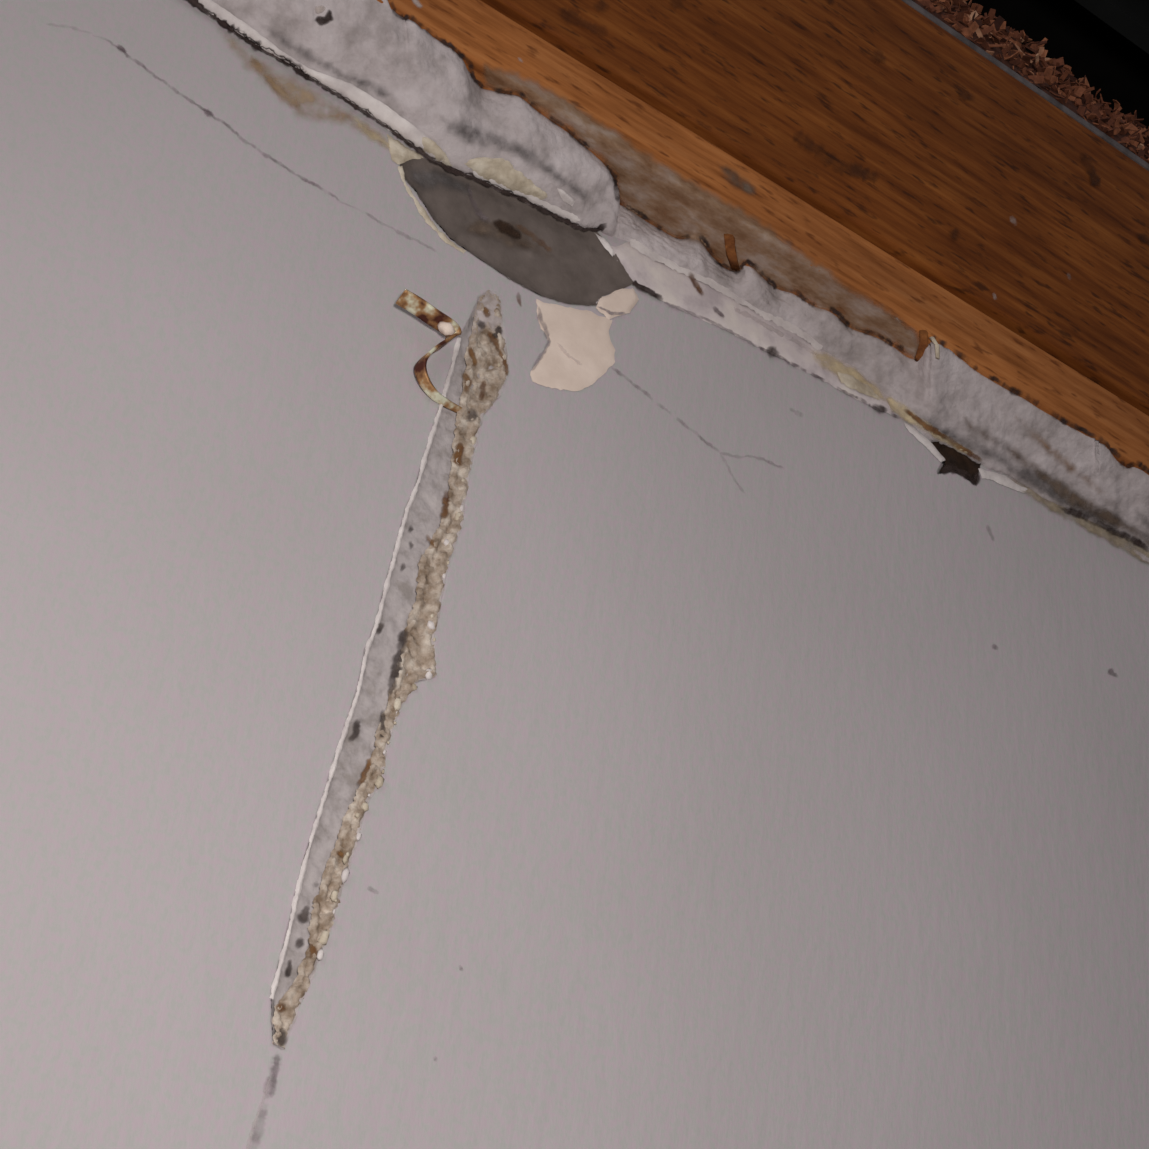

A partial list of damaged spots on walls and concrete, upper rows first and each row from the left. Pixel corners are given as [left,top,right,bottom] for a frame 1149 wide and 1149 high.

crack [187,0,605,232]
spalling [198,0,1027,493]
spalling [272,290,508,1048]